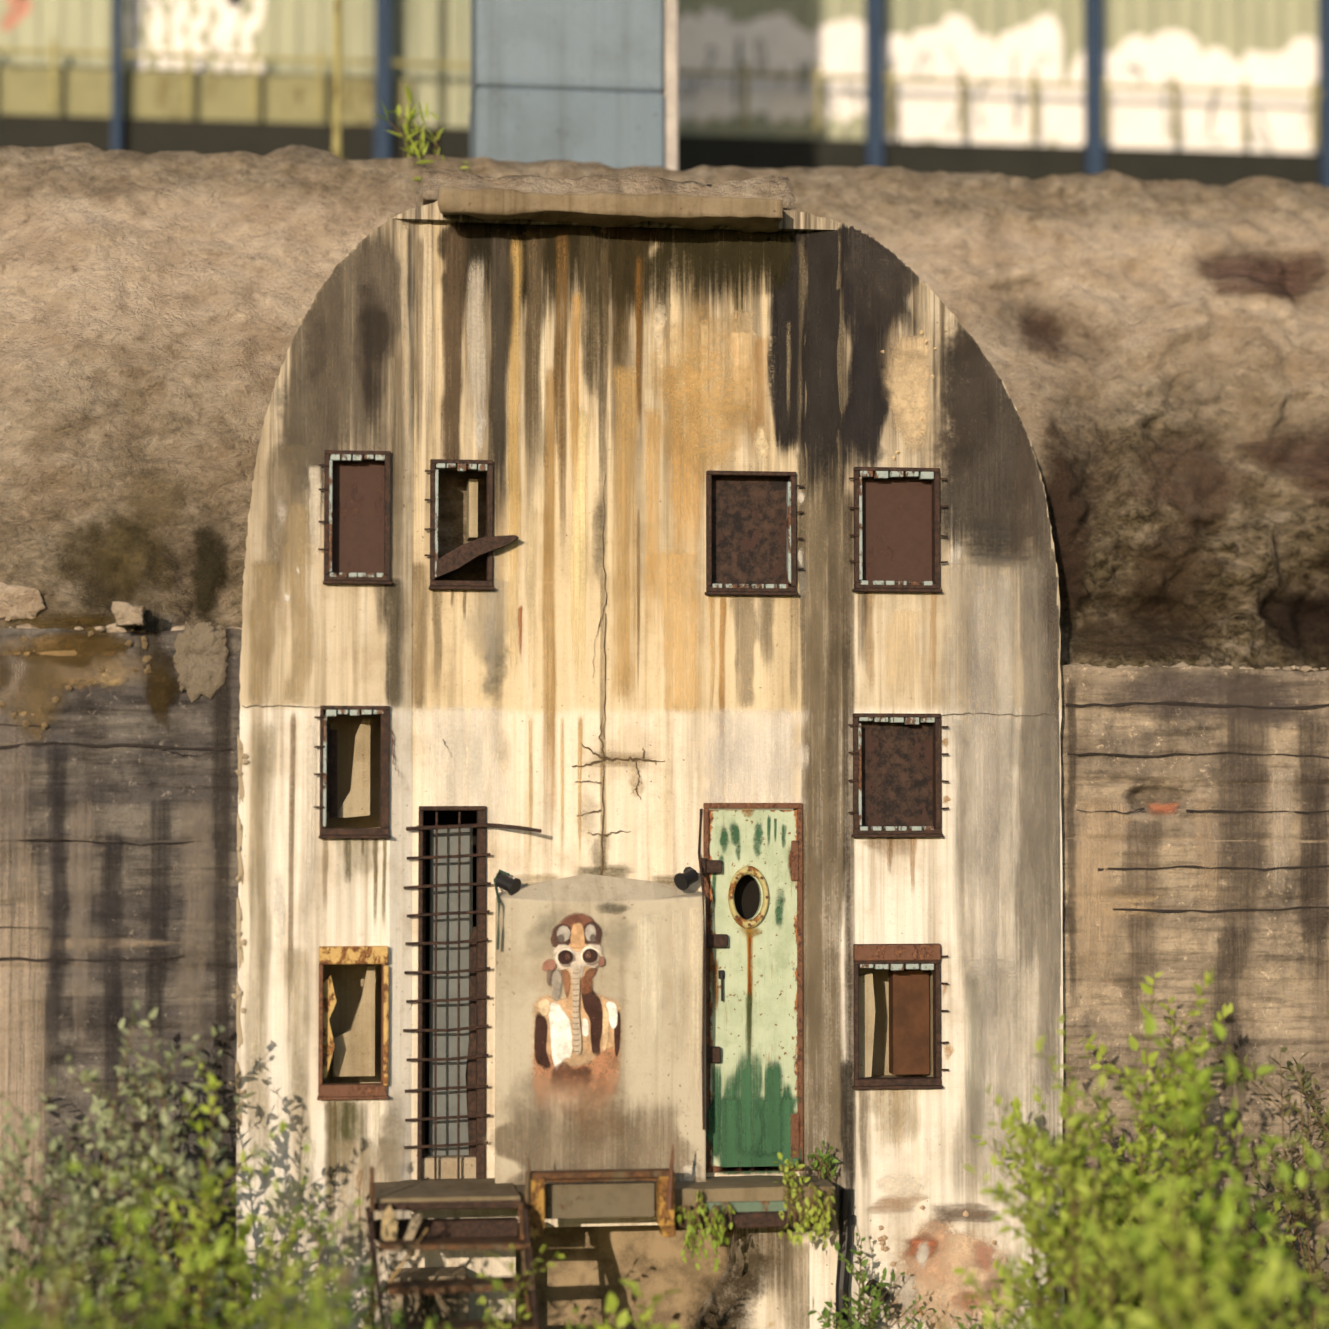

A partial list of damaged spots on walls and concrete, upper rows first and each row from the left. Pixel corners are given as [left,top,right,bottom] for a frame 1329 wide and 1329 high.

water stain [0,606,172,1311]
spalling [0,621,229,739]
water stain [181,631,230,1128]
rust [509,243,520,530]
rust [543,296,582,832]
water stain [250,222,919,1245]
crack [572,474,663,875]
rust [616,257,659,691]
peeling [706,1054,800,1174]
peeling [708,711,808,904]
peeling [775,897,784,924]
water stain [1113,675,1327,961]